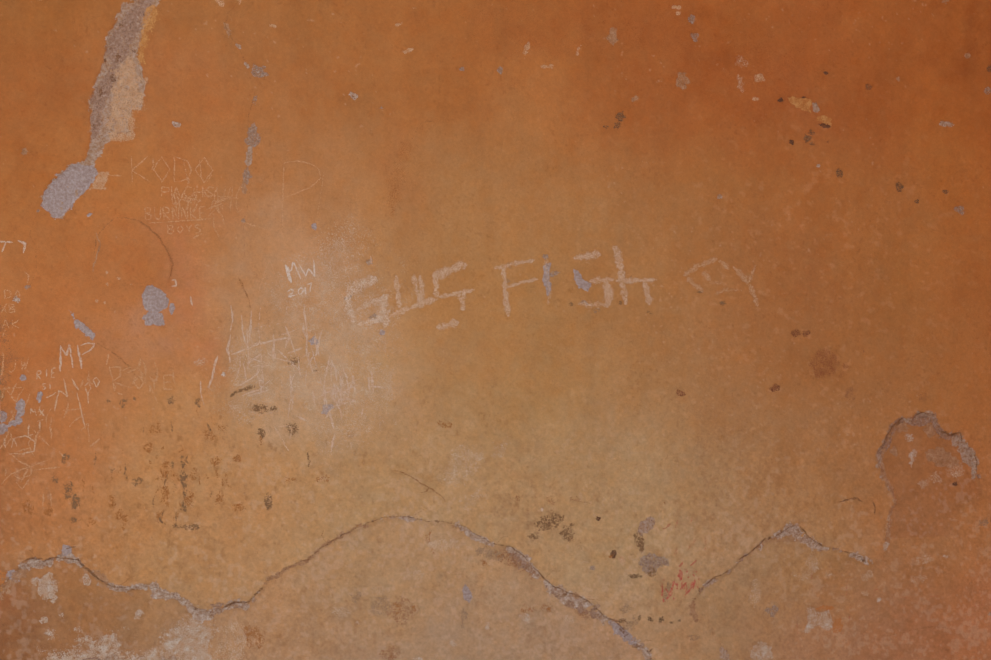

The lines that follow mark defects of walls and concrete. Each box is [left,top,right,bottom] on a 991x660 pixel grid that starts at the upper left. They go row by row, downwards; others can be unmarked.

flaking render [40,0,160,220]
peeling [777,96,832,146]
peeling [142,285,175,326]
peeling [0,309,43,434]
flaking render [0,516,650,660]
crack [0,470,653,660]
crack [688,522,873,622]
peeling [802,608,833,633]